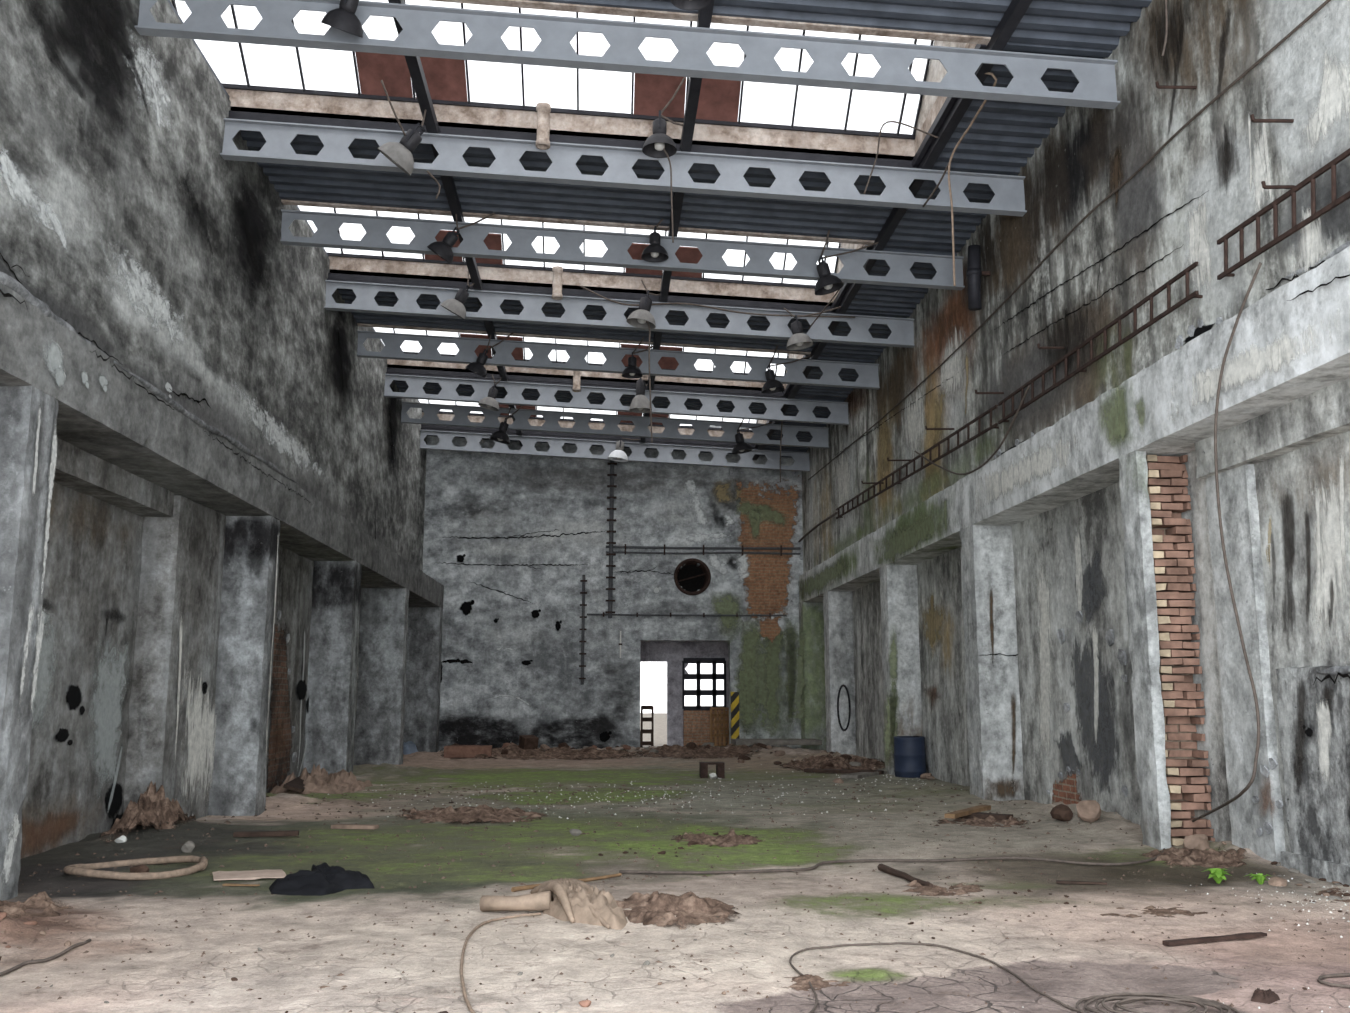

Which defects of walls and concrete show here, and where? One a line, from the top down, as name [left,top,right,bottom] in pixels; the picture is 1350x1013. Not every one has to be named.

leakage [46,38,86,97]
leakage [108,18,172,128]
crack [0,253,29,310]
crack [1266,260,1350,301]
crack [64,319,312,505]
spalling [728,469,803,648]
leakage [1266,519,1276,599]
leakage [1305,455,1350,640]
leakage [1294,681,1333,784]